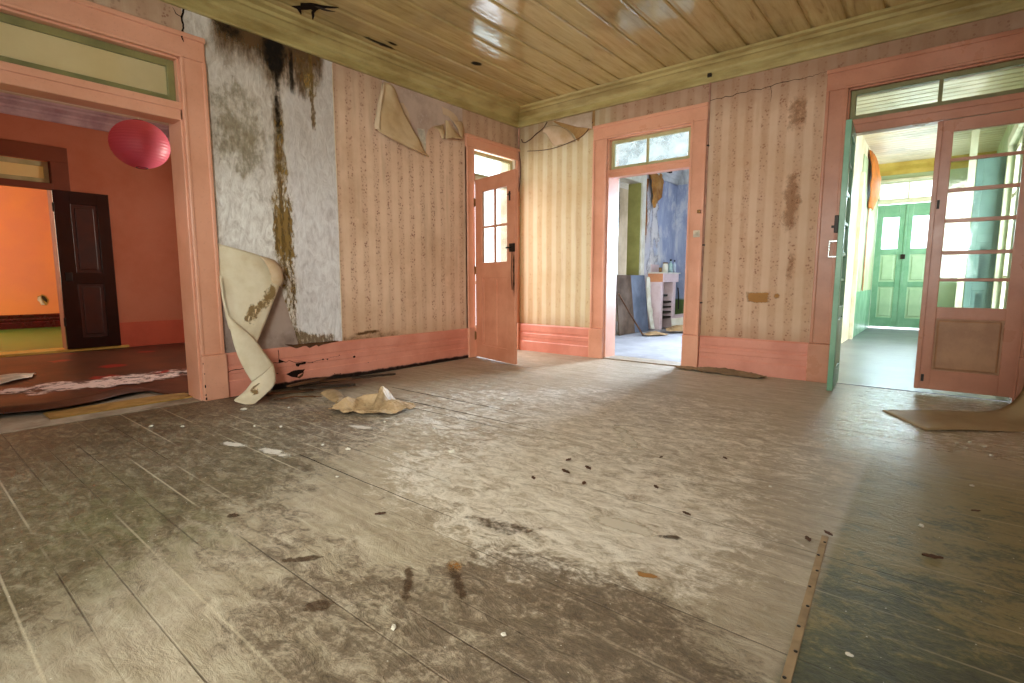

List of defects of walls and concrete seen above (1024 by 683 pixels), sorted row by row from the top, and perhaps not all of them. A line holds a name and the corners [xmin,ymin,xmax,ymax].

crack [173,8,185,42]
damp [212,19,323,177]
flaking render [374,80,464,157]
peeling [553,110,595,141]
flaking render [181,8,343,404]
damp [294,328,333,344]